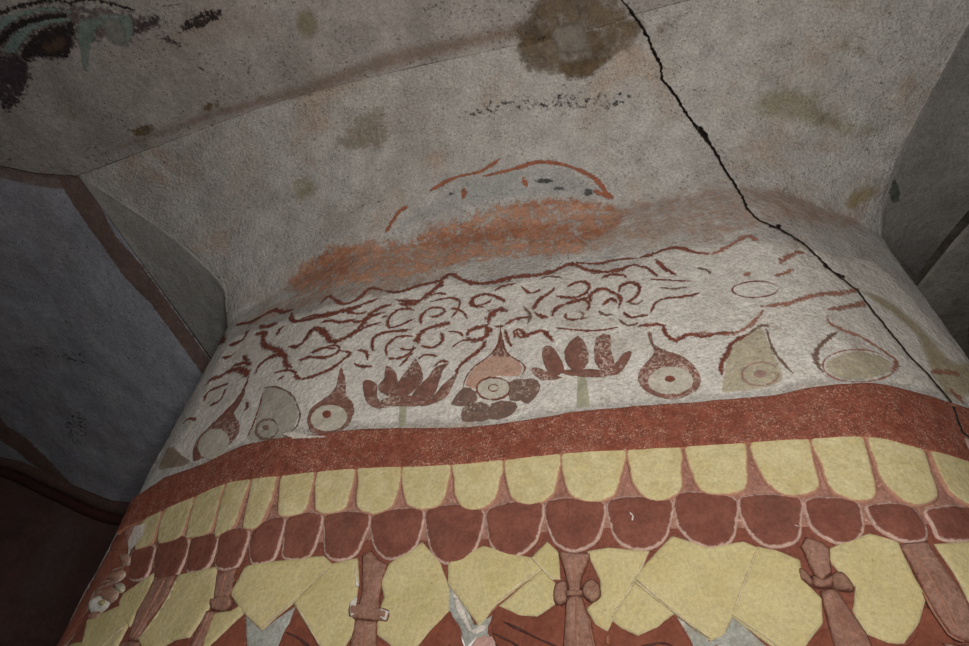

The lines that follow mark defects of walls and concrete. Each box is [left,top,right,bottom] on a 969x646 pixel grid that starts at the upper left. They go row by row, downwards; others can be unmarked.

water stain [517,0,640,77]
crack [621,0,969,438]